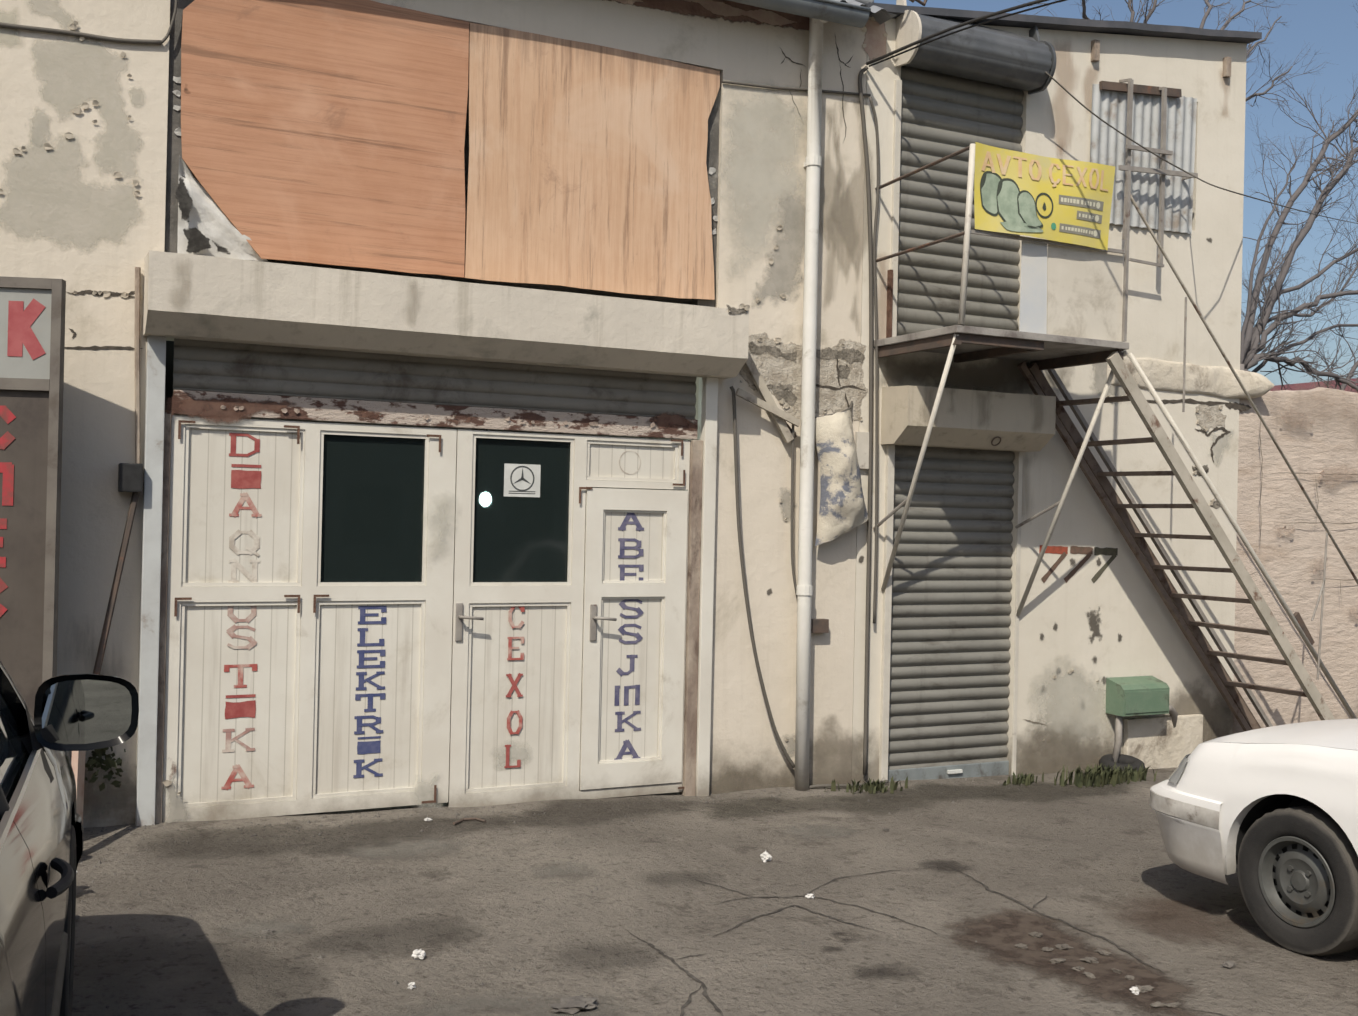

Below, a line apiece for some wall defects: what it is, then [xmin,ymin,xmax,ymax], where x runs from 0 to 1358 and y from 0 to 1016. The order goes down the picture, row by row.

peeling [608,0,809,30]
peeling [0,0,143,249]
flaking render [740,333,868,421]
rust [164,396,300,424]
rust [649,412,697,431]
flaking render [1192,404,1230,476]
peeling [779,491,791,521]